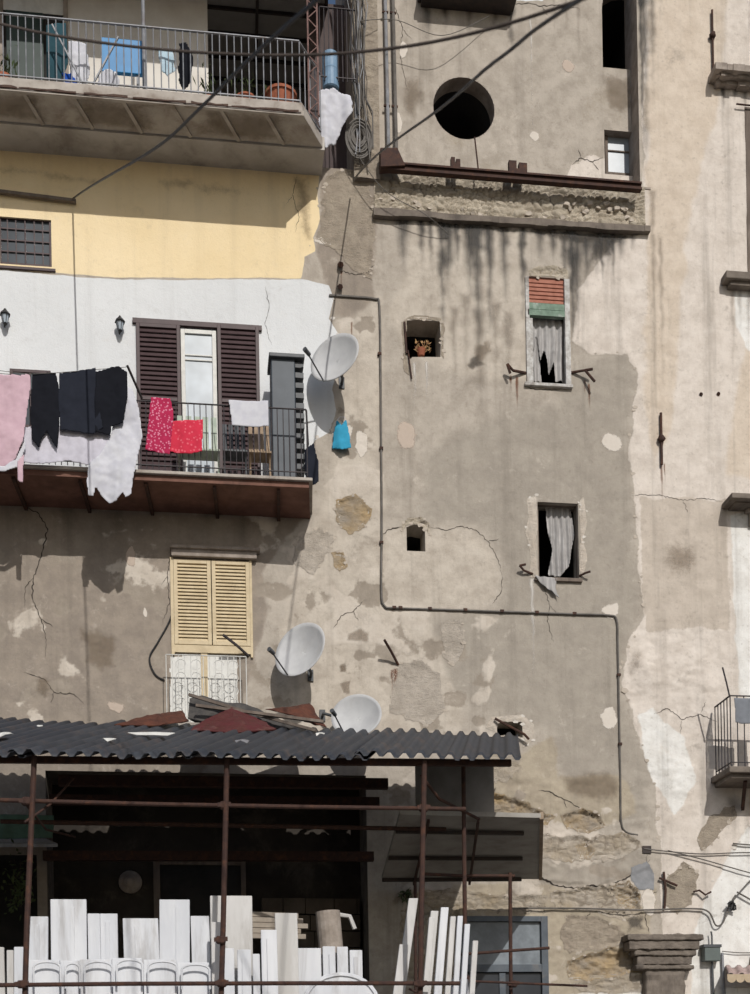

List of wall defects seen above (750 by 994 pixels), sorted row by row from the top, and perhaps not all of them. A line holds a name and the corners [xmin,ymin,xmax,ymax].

leakage [397,220,507,272]
spalling [309,168,646,281]
leakage [537,229,633,292]
crack [24,508,84,704]
spalling [292,493,372,575]
crack [431,526,503,604]
spalling [486,714,535,747]
crack [654,703,717,732]
spalling [467,754,662,863]
spalling [399,880,643,994]